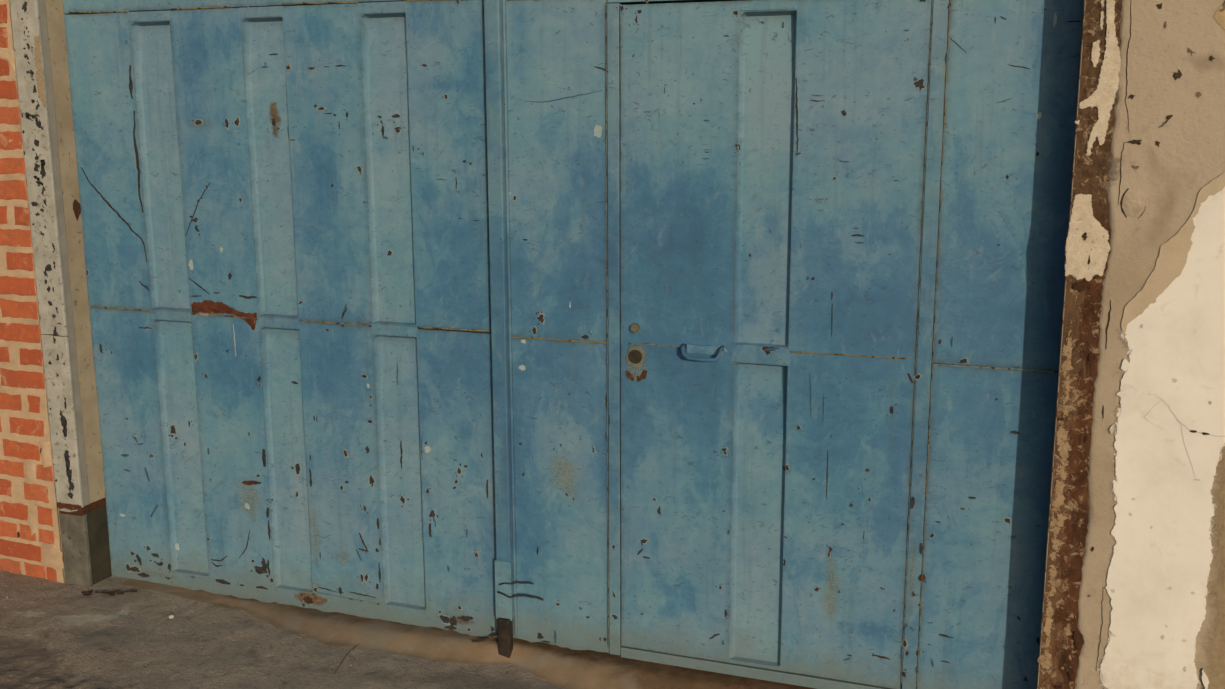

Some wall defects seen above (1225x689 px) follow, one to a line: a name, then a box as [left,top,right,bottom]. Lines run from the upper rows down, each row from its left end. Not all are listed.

peeling [1075,0,1135,156]
spalling [1128,115,1173,147]
corrosion [1071,232,1098,292]
peeling [1064,193,1111,281]
corrosion [191,300,257,330]
peeling [1098,173,1225,689]
corrosion [57,498,106,516]
corrosion [1073,631,1084,651]